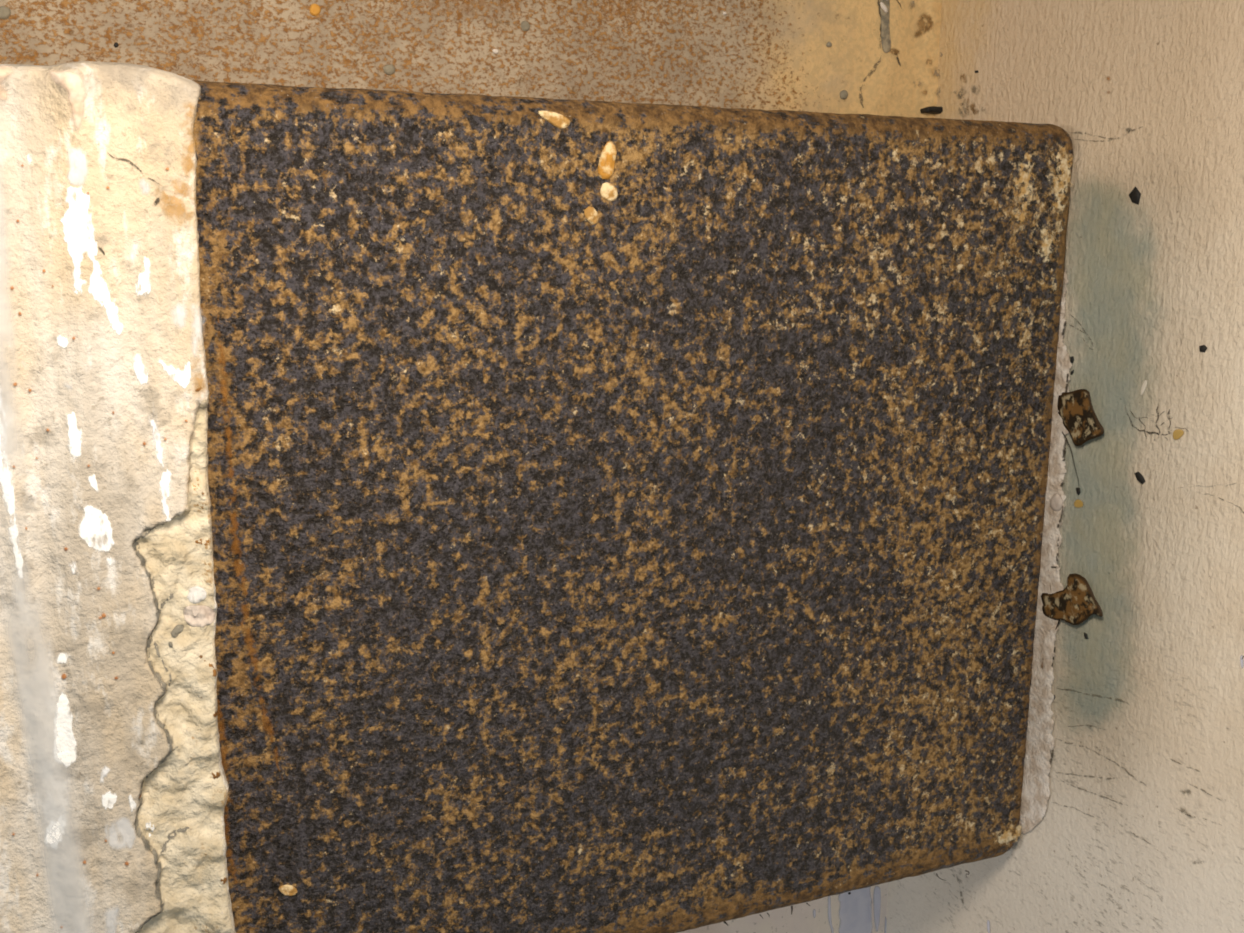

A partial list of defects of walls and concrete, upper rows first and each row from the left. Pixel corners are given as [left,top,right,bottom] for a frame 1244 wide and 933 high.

rust [0,0,822,113]
crack [859,0,902,108]
rust [164,136,196,216]
efflorescence [1013,147,1073,229]
efflorescence [1035,228,1054,262]
rust [226,428,283,779]
spalling [136,400,233,933]
rust [212,699,226,779]
rust [220,797,237,884]